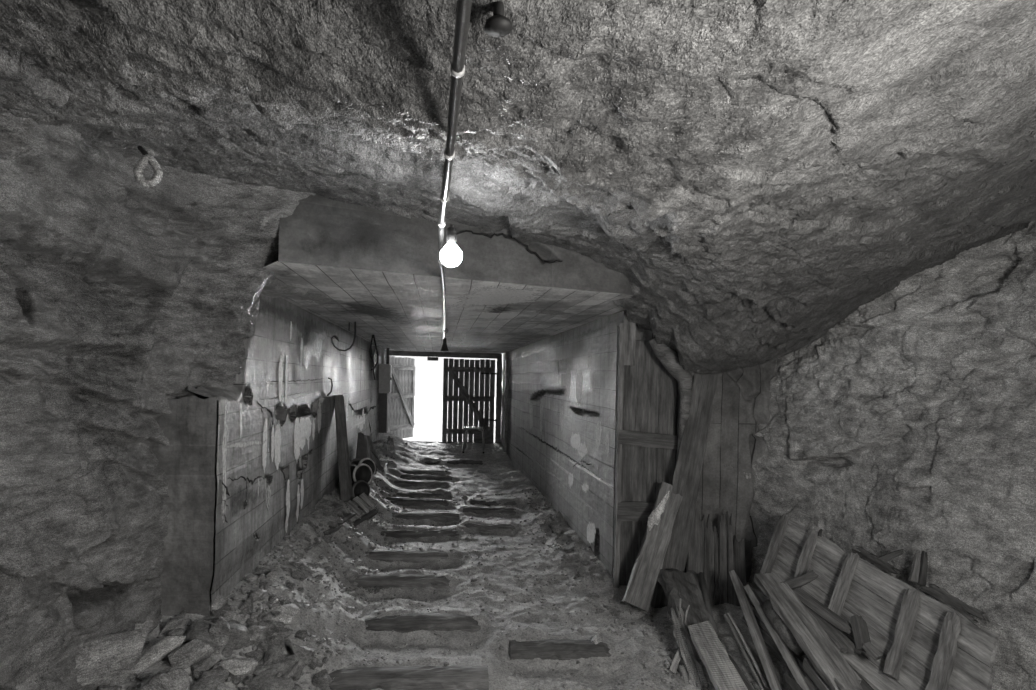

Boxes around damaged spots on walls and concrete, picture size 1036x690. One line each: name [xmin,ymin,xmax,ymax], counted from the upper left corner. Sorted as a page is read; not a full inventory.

crack [456,230,562,264]
spalling [244,385,253,406]
spalling [275,377,333,427]
spalling [264,448,313,484]
crack [220,475,266,523]